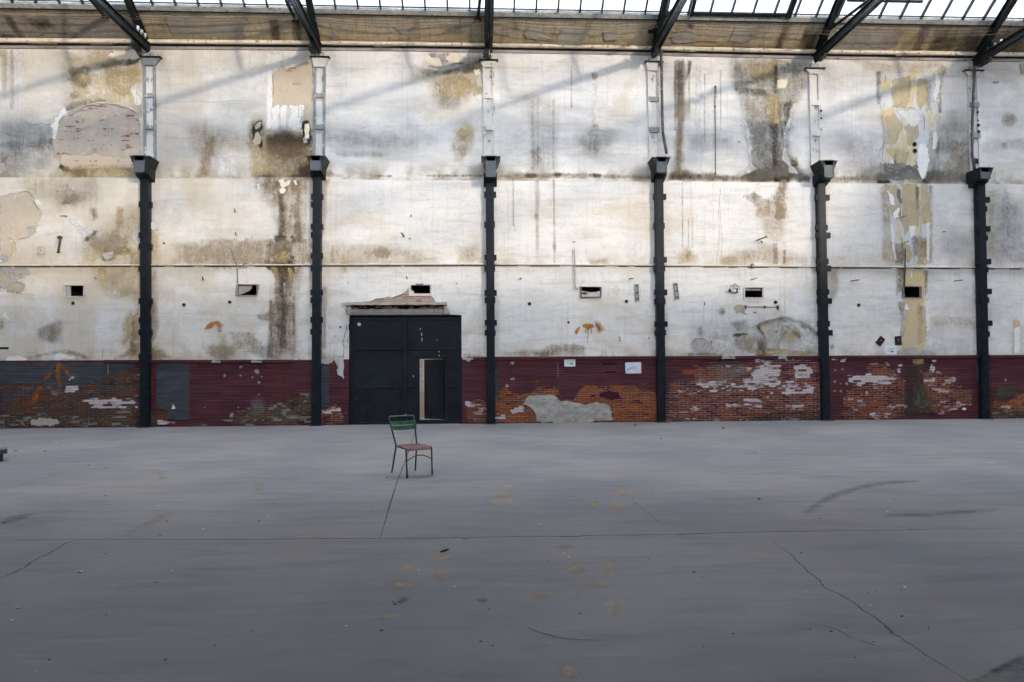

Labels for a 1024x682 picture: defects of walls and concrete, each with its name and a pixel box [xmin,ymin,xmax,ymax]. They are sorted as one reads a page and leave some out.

spalling [50,102,142,170]
leakage [735,28,806,220]
peeling [0,191,42,294]
peeling [832,65,975,420]
peeling [0,369,140,428]
peeling [465,356,820,424]
crack [767,538,966,680]